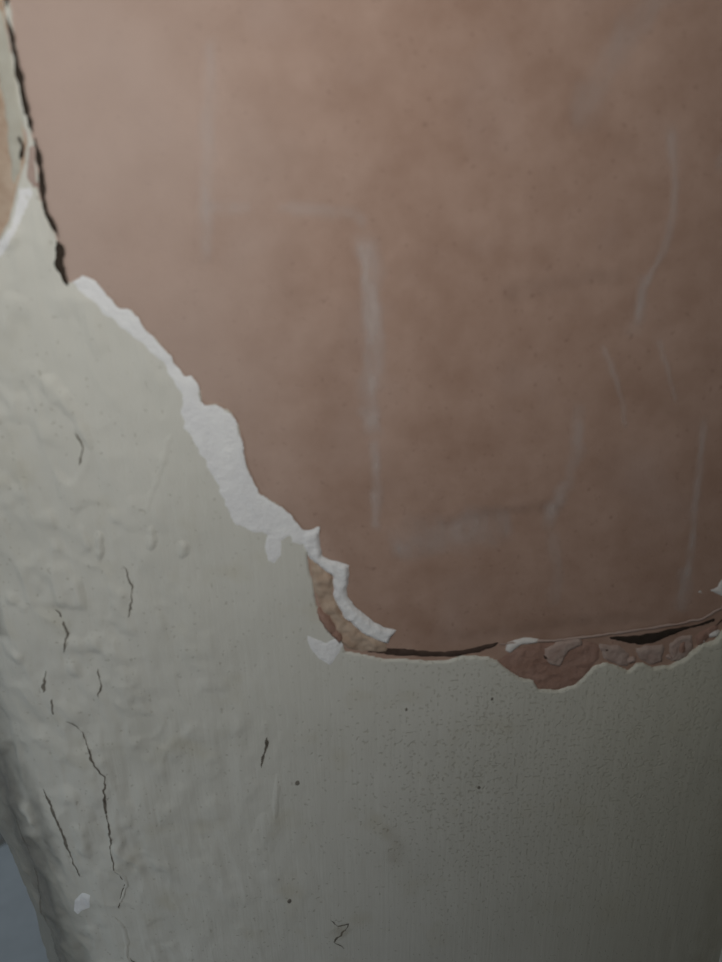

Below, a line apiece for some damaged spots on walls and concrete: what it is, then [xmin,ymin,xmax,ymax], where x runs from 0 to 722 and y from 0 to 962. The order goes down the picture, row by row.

peeling [0,0,722,690]
crack [124,567,133,617]
crack [55,609,69,653]
crack [261,738,269,768]
crack [41,671,134,962]